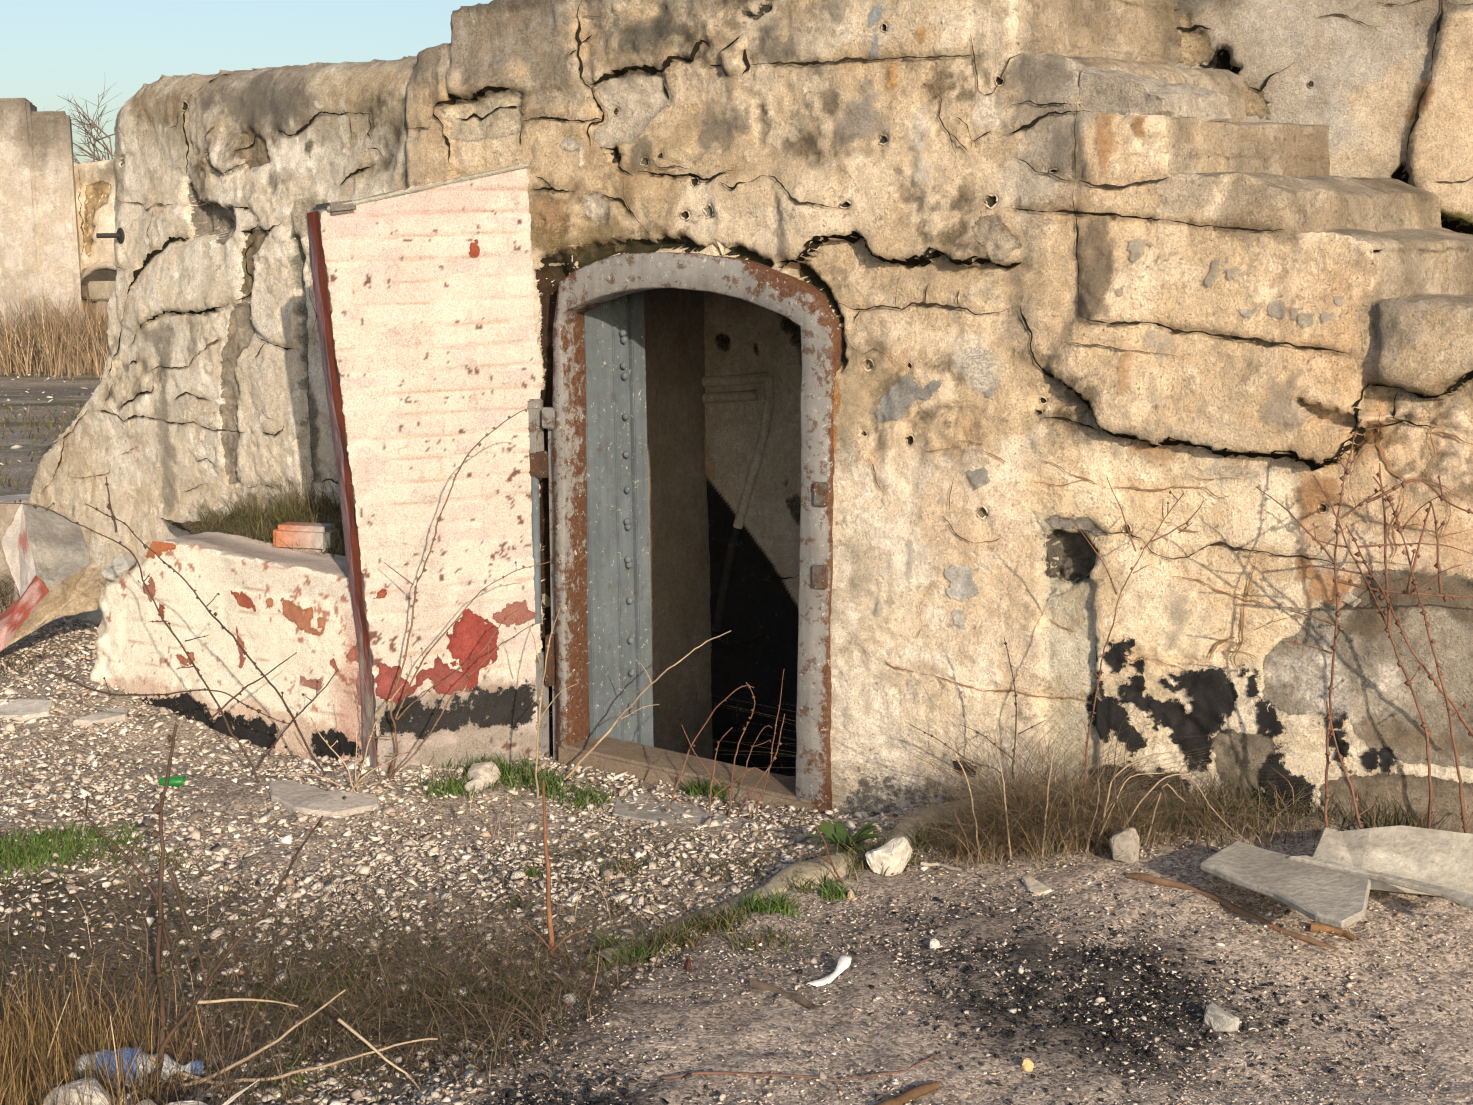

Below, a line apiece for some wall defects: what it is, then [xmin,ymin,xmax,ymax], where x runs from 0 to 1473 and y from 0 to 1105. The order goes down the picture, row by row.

leakage [290,234,320,482]
crack [32,0,1473,673]
peeling [146,541,176,559]
spalling [273,522,339,553]
peeling [138,577,165,619]
peeling [176,652,195,666]
peeling [231,591,326,669]
peeling [300,476,551,706]
crack [878,582,1092,704]
peeling [1079,569,1473,834]
peeling [310,728,361,762]